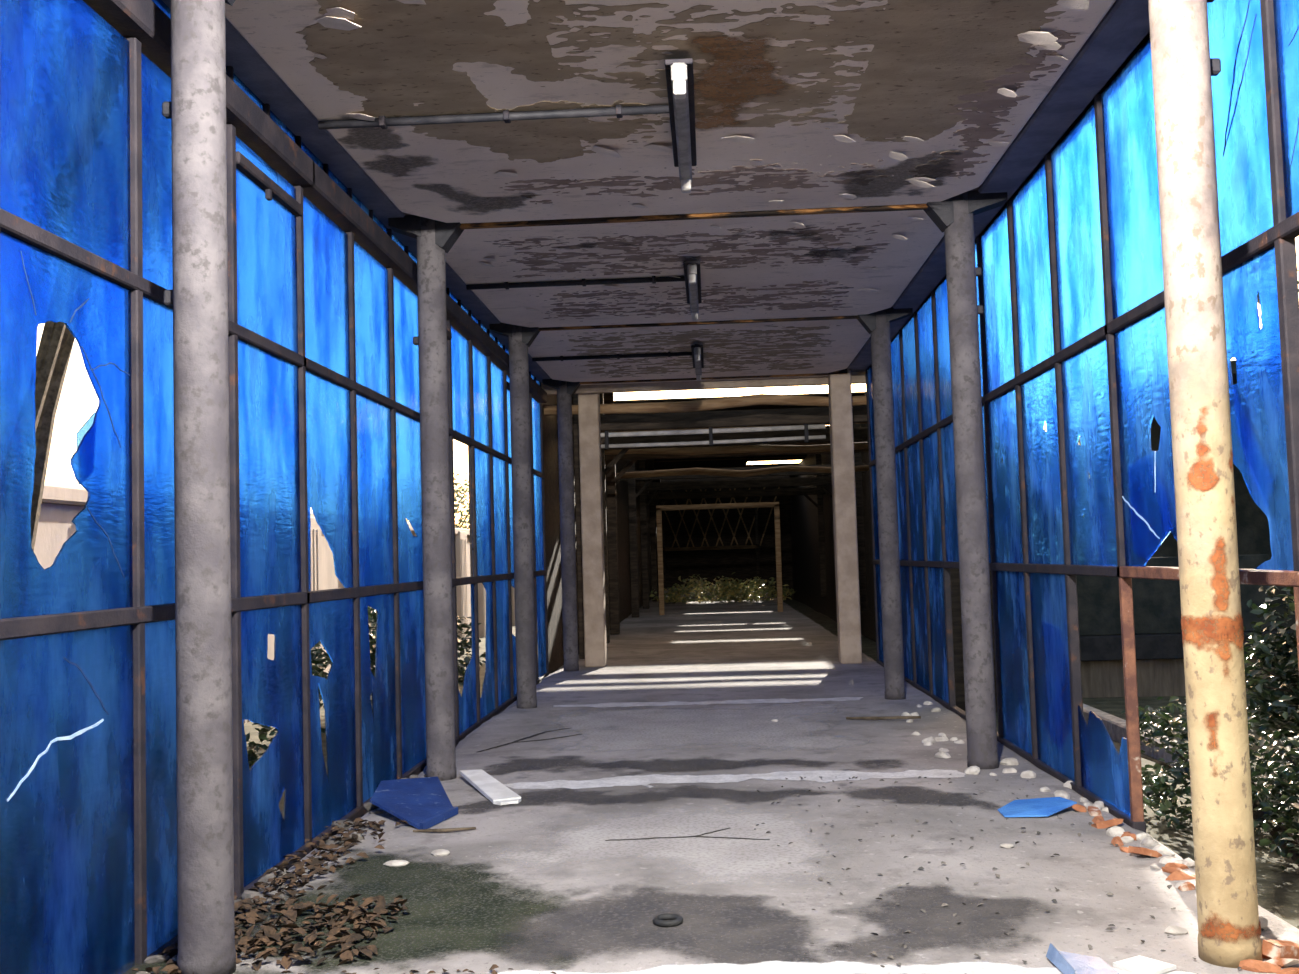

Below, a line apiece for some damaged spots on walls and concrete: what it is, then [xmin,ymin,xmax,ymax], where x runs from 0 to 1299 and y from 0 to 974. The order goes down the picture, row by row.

peeling [296,0,1089,208]
peeling [478,222,908,378]
corrosion [1187,408,1233,491]
corrosion [1181,538,1299,674]
corrosion [1206,712,1218,749]
water stain [501,886,1037,965]
corrosion [1201,916,1261,941]